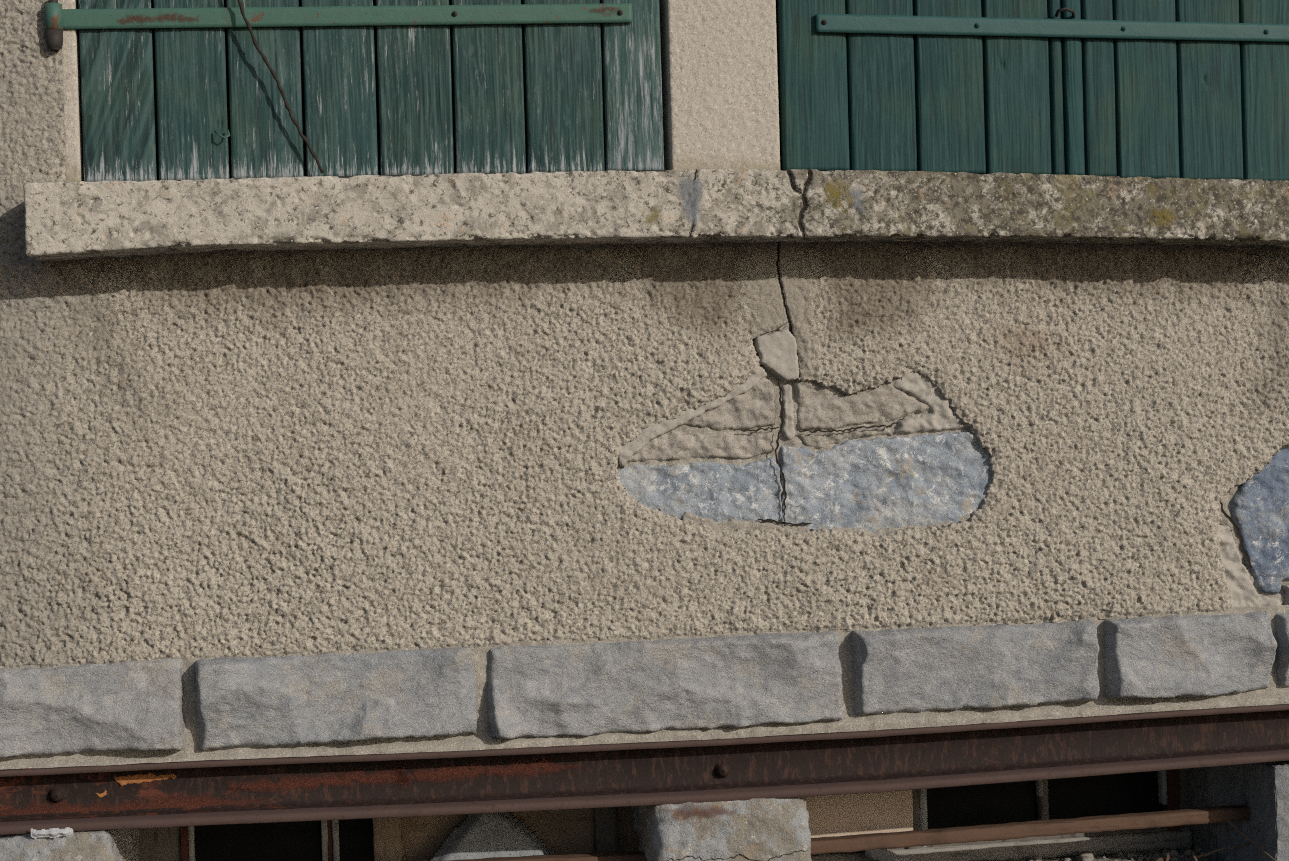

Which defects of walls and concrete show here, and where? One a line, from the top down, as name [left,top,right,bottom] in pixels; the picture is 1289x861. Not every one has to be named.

crack [689,169,697,238]
crack [753,168,811,340]
flaking render [617,365,991,537]
flaking render [1218,439,1289,608]
peeling [31,827,73,839]
crack [662,850,803,861]